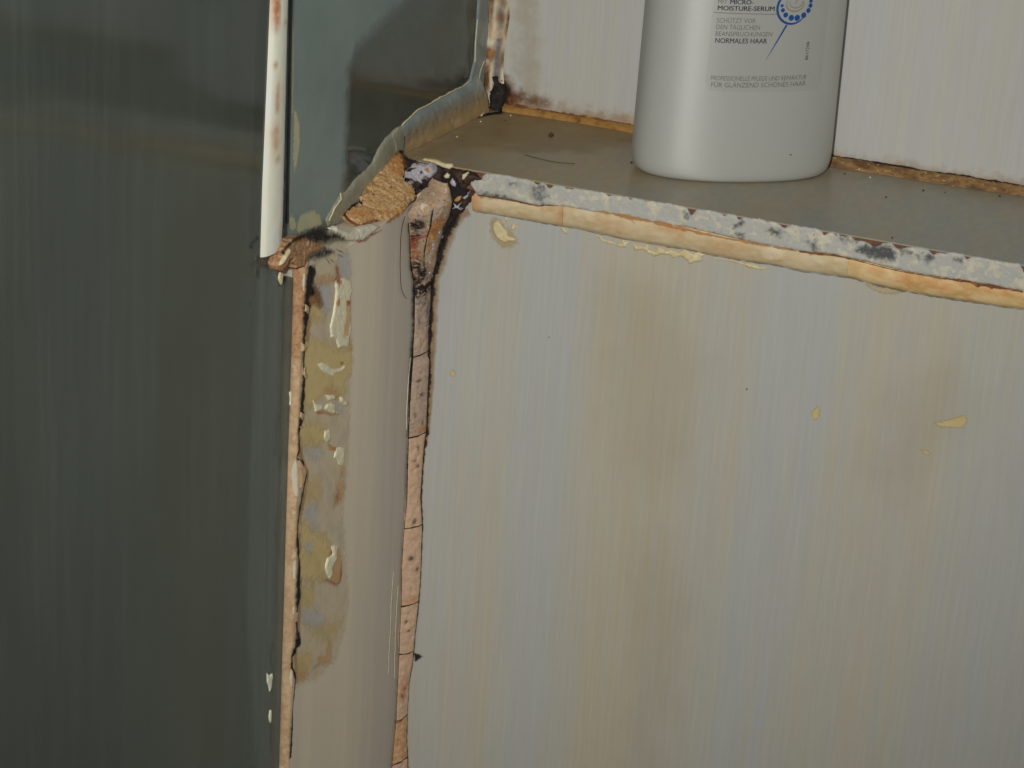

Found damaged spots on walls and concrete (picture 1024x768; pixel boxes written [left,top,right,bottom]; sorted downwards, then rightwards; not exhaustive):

peeling [404,162,437,190]
crack [415,209,434,290]
peeling [470,173,1024,292]
peeling [330,278,352,348]
peeling [318,362,345,377]
peeling [313,395,348,415]
peeling [324,429,345,466]
crack [289,265,313,759]
peeling [325,545,338,579]